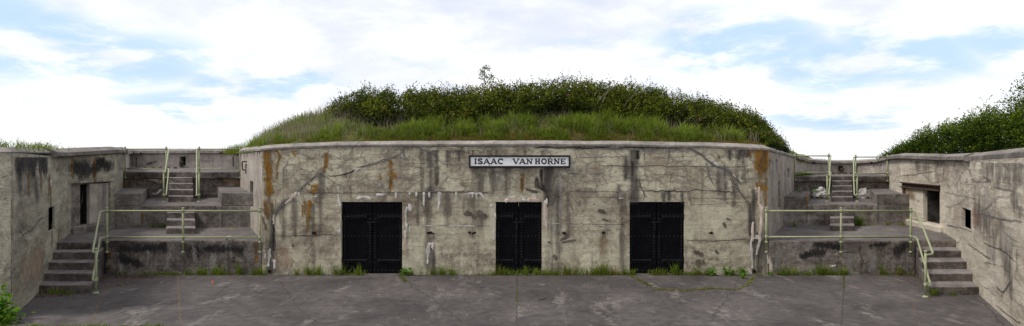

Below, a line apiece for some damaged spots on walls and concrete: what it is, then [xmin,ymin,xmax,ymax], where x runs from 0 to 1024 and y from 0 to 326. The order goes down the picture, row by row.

leakage [16,157,51,199]
corrosion [261,150,296,229]
corrosion [302,152,328,231]
crack [254,146,751,243]
corrosion [749,150,770,206]
leakage [425,238,435,272]
crack [902,168,1021,323]